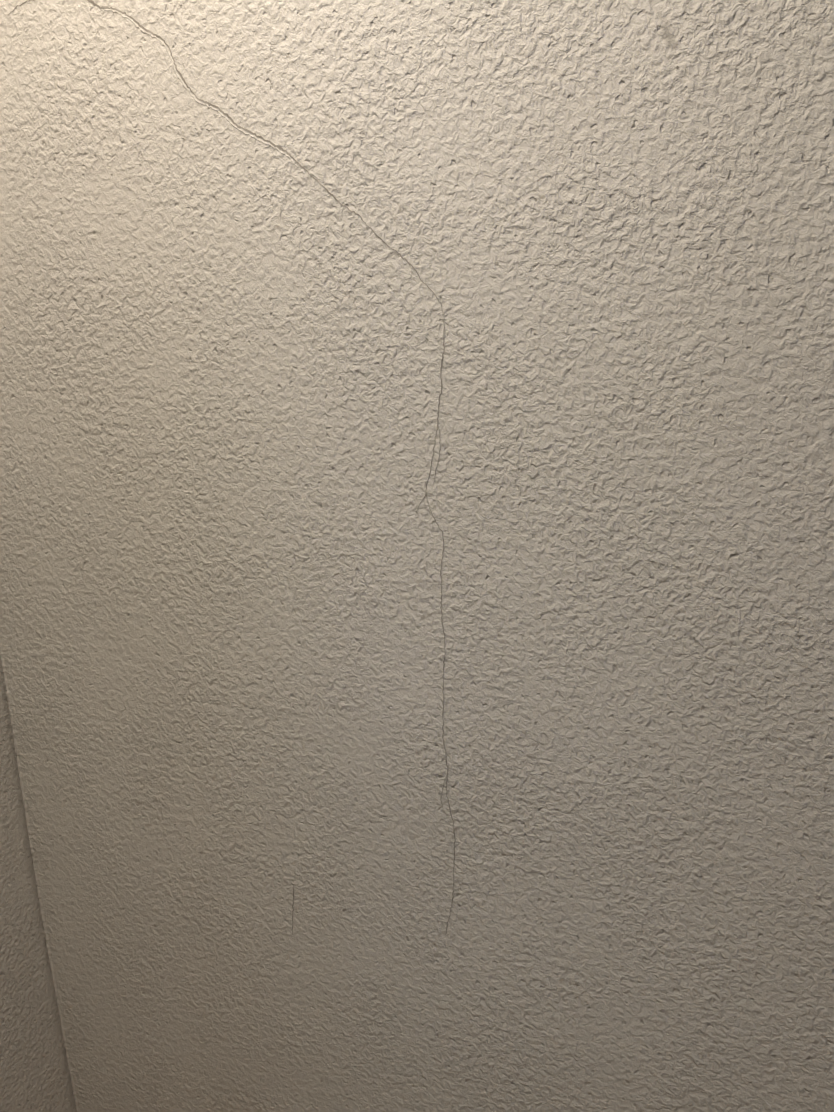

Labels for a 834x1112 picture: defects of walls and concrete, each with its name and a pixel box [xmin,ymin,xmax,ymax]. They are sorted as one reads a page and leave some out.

crack [88,0,456,935]